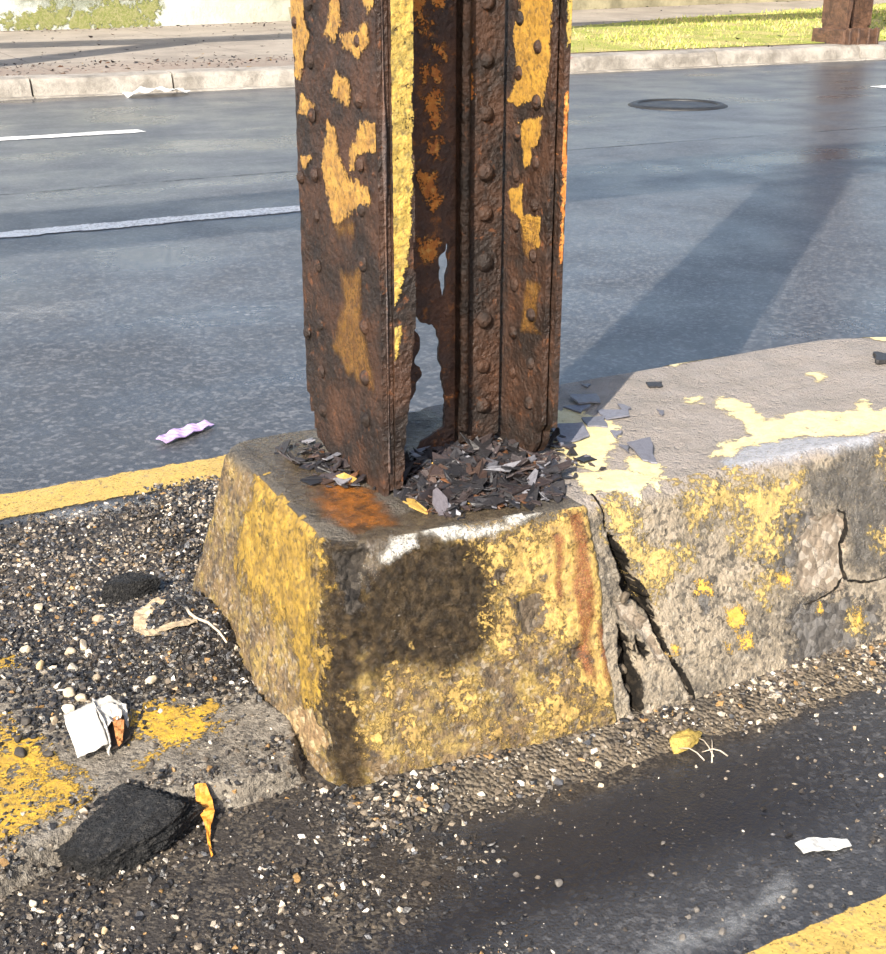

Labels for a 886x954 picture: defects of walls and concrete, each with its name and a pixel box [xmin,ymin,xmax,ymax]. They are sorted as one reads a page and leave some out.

peeling [390,0,414,307]
rust [413,0,448,214]
rust [555,88,569,264]
rust [334,269,372,386]
peeling [394,325,403,360]
peeling [805,371,831,383]
peeling [233,472,372,755]
rust [322,485,393,530]
rust [555,513,610,680]
peeling [340,396,886,770]
crack [591,494,695,712]
crack [804,509,886,605]